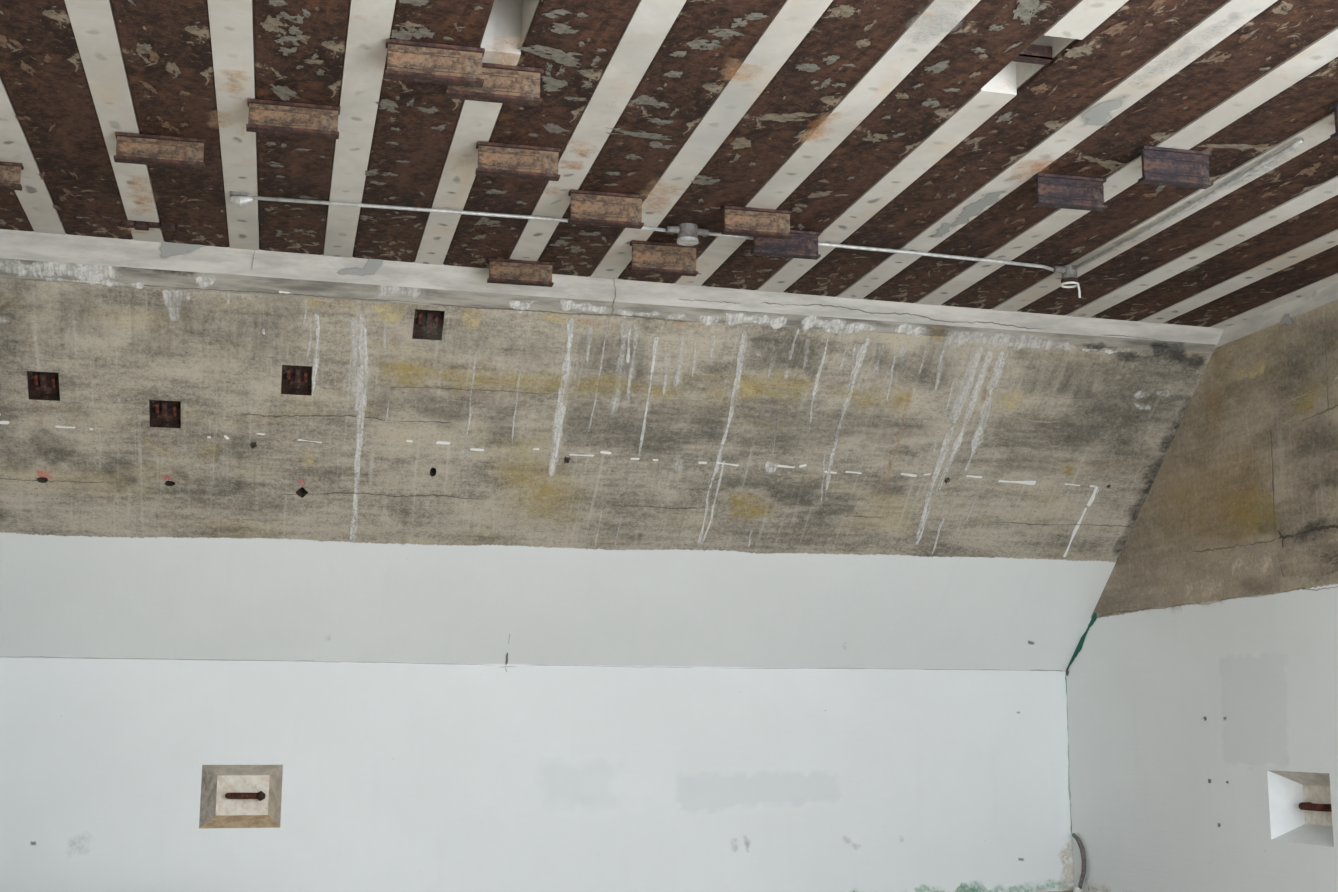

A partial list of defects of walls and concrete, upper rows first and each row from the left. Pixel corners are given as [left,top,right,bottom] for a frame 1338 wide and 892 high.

peeling [517,9,606,101]
peeling [604,13,768,186]
peeling [757,112,816,138]
peeling [895,47,988,108]
peeling [988,0,1049,31]
water stain [304,298,320,392]
water stain [350,307,399,542]
water stain [511,314,637,501]
water stain [698,329,828,544]
water stain [900,349,1018,554]
crack [991,522,1130,565]
crack [1031,330,1338,834]